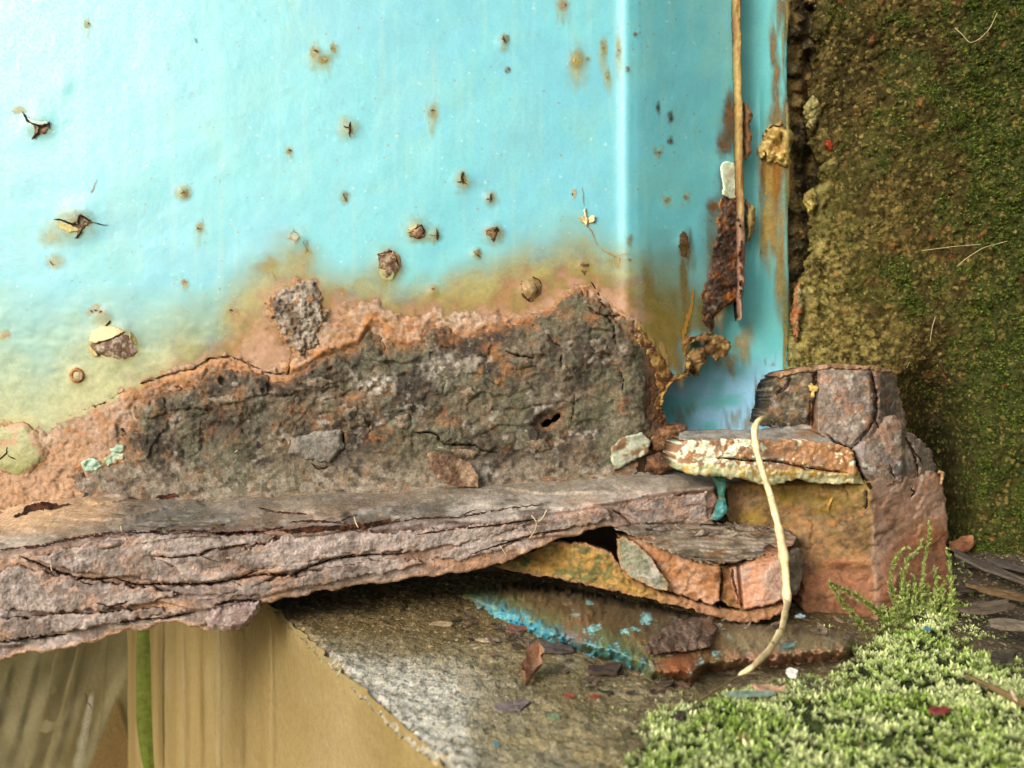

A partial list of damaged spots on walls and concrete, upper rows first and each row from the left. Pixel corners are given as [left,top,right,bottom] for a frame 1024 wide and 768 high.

peeling [0,285,669,509]
rust [0,97,788,502]
crack [410,406,496,453]
crack [0,503,570,623]